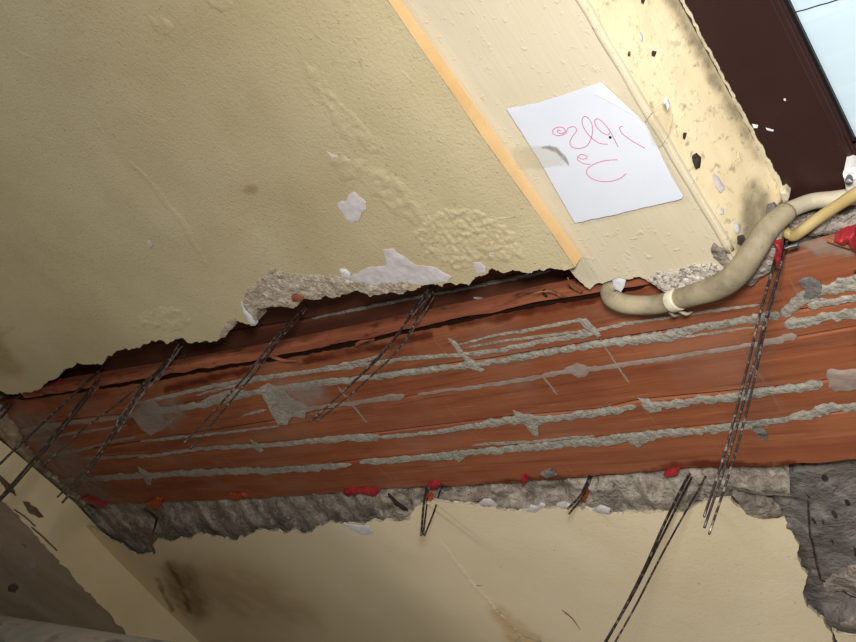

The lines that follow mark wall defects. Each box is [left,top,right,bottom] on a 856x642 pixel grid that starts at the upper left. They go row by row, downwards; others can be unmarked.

peeling [337,192,366,223]
peeling [473,262,486,274]
flaking render [218,249,452,339]
flaking render [612,278,626,292]
rust [165,368,250,392]
spalling [0,391,856,642]